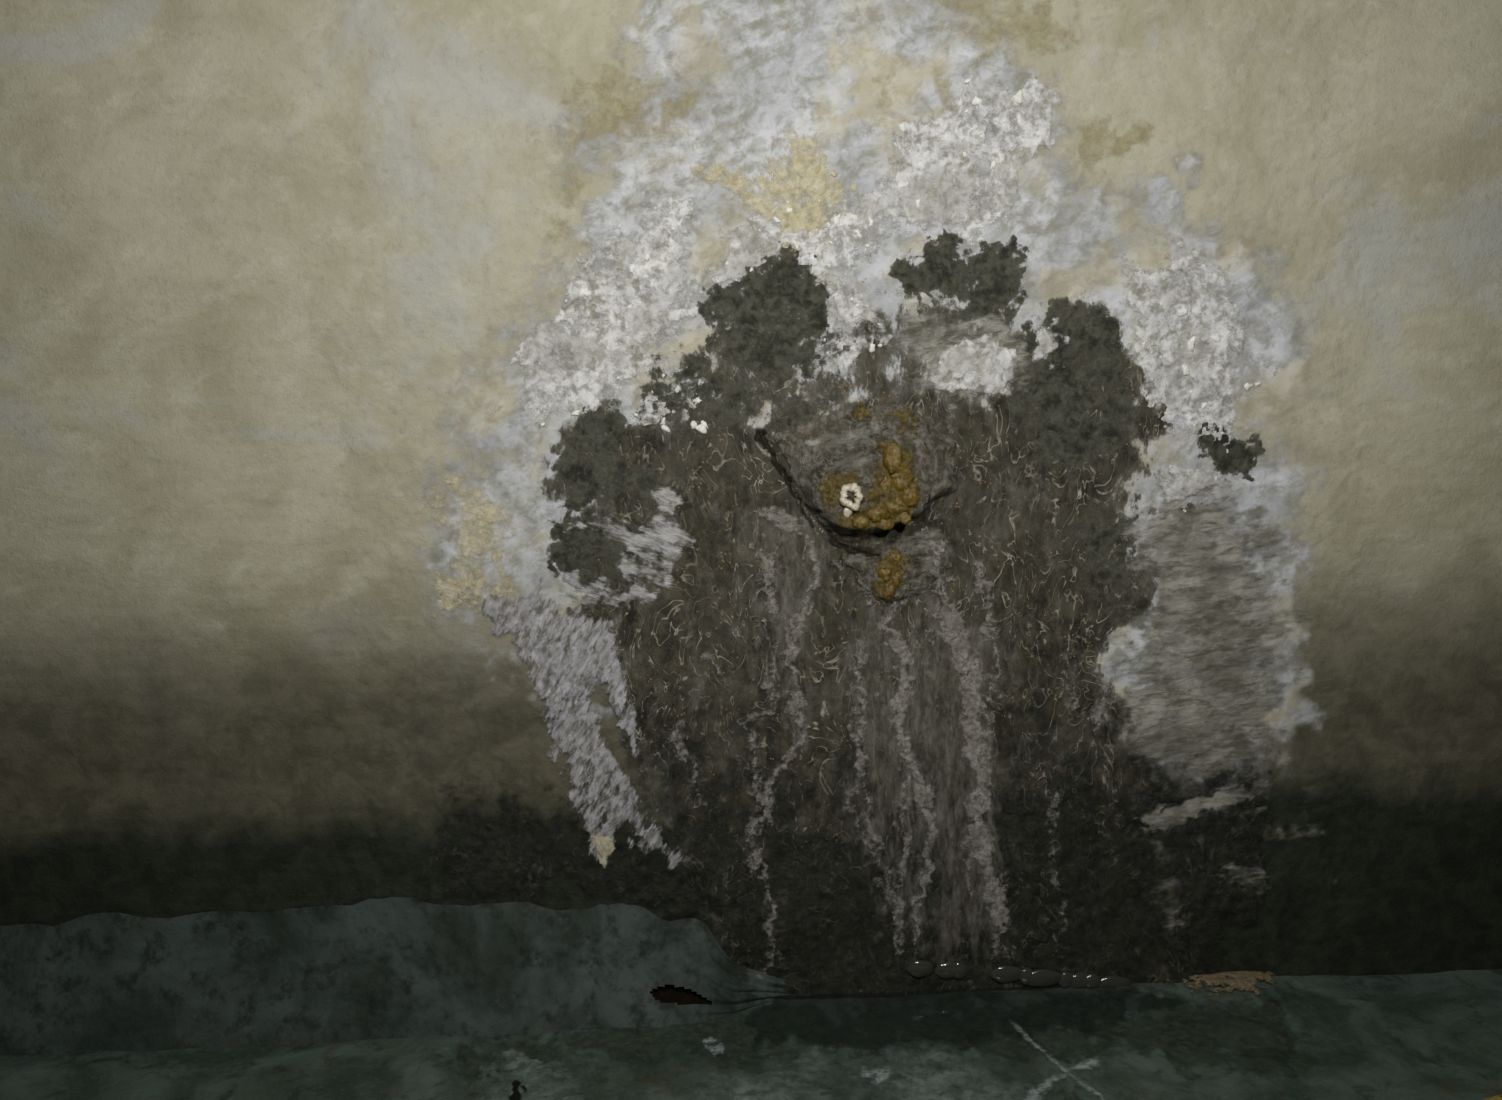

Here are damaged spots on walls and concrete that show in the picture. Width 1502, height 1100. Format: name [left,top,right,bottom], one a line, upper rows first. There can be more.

crack [754,429,931,582]
water stain [416,0,1322,1100]
corrosion [817,405,924,539]
corrosion [870,547,911,602]